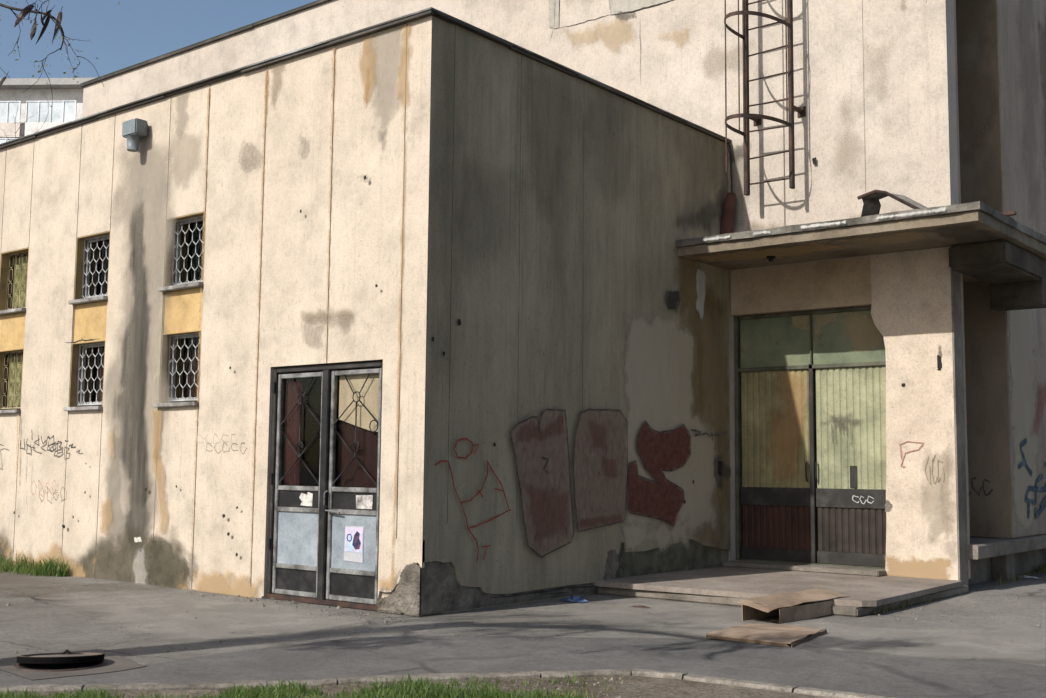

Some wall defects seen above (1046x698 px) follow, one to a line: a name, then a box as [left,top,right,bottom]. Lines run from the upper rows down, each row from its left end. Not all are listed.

spalling [609,0,673,20]
water stain [77,152,192,589]
peeling [615,291,731,578]
spalling [377,561,598,617]